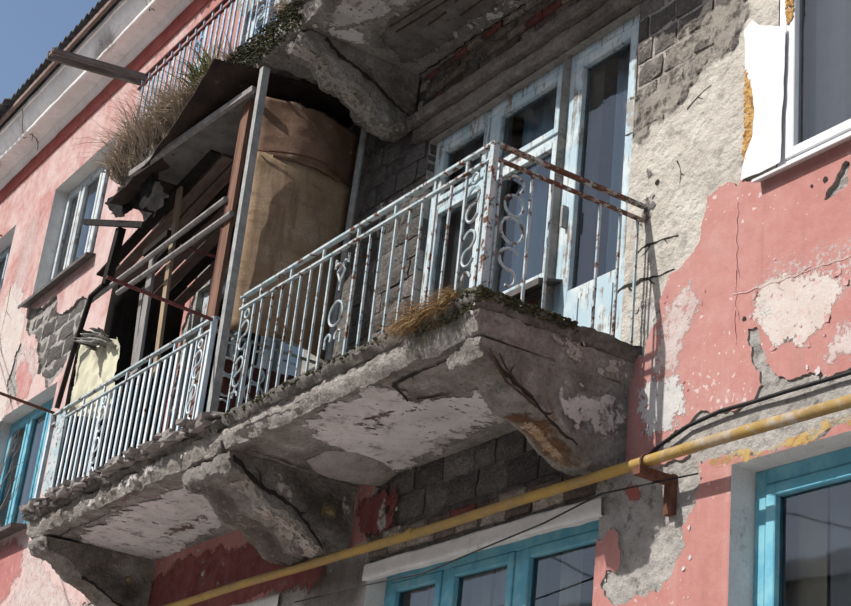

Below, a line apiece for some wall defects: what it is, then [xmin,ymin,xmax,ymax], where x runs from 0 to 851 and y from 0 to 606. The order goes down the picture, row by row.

crack [325,37,409,117]
flaking render [312,0,581,113]
spalling [0,213,87,421]
crack [618,268,675,300]
crack [638,235,678,253]
spalling [600,0,851,452]
crack [391,360,449,402]
crack [489,348,578,446]
rust [507,414,577,468]
crack [233,449,358,549]
peeling [0,537,94,606]